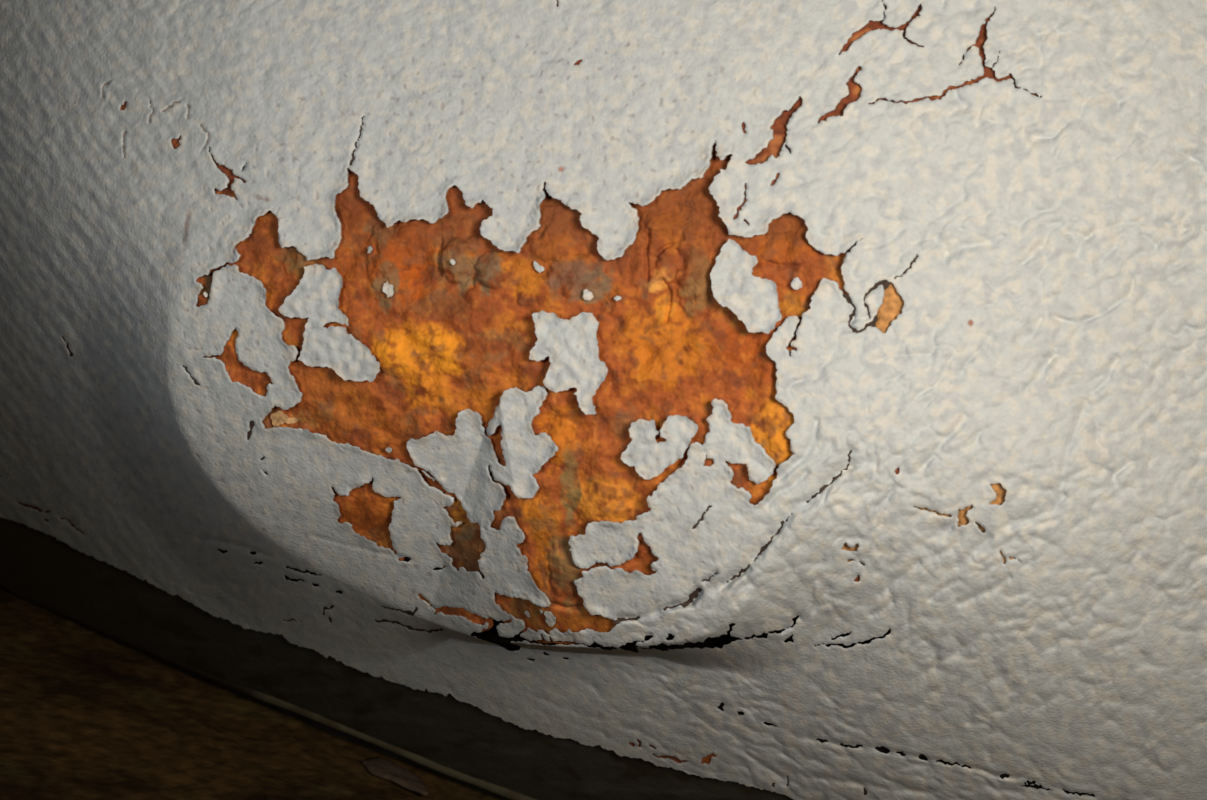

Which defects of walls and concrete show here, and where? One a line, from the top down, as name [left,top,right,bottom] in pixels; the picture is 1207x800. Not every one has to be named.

peeling [196,142,918,645]
peeling [990,483,1007,505]
peeling [914,505,986,533]
crack [375,450,891,661]
crack [218,549,343,623]
crack [717,703,777,727]
crack [816,738,971,769]
crack [1000,773,1095,797]